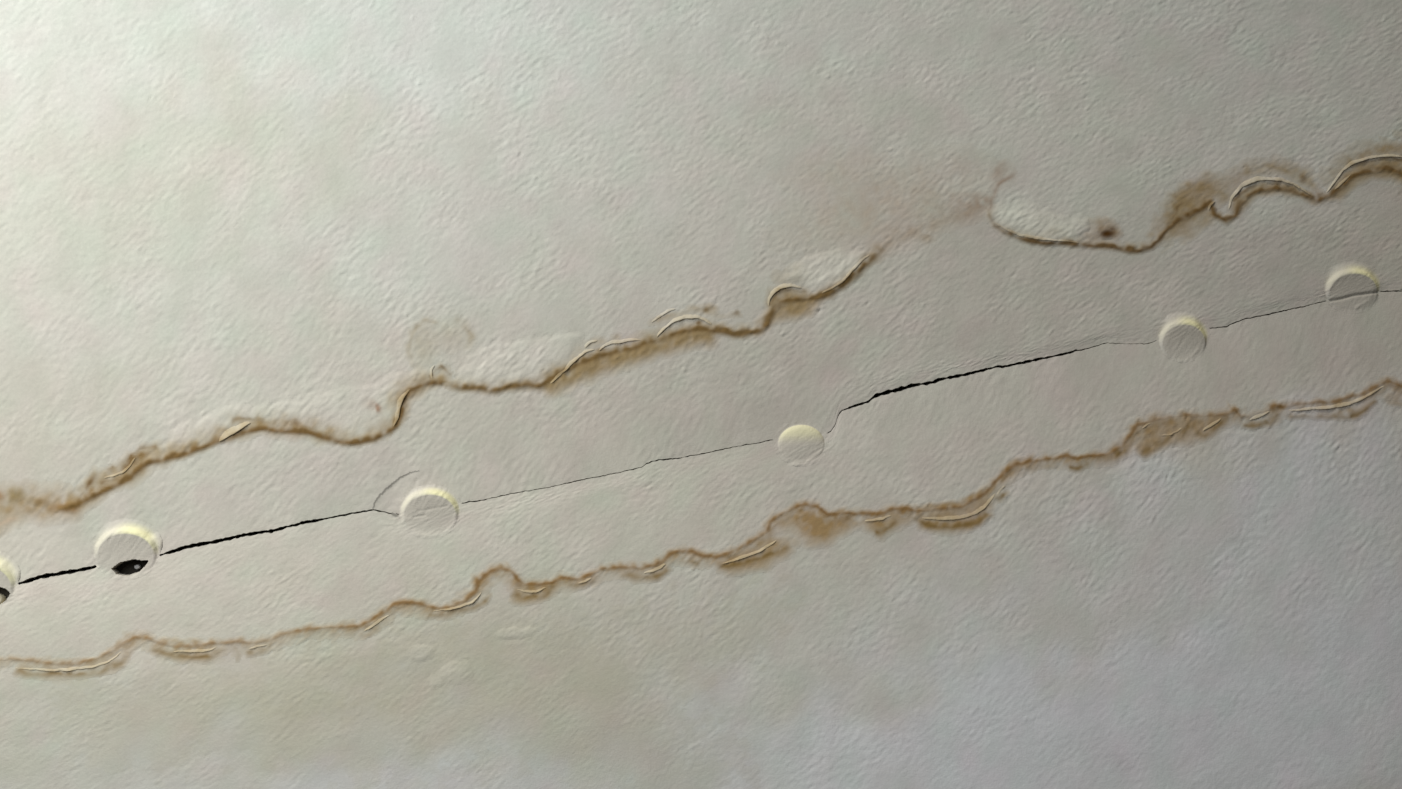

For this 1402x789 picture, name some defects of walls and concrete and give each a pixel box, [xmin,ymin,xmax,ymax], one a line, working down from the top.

peeling [1208,154,1402,211]
water stain [51,129,1402,515]
crack [1210,301,1325,329]
crack [828,341,1155,433]
peeling [1288,386,1384,411]
peeling [219,421,250,442]
crack [463,440,771,504]
crack [163,470,419,555]
peeling [922,486,1005,520]
peeling [722,540,777,564]
crack [22,565,97,584]
peeling [16,652,121,672]